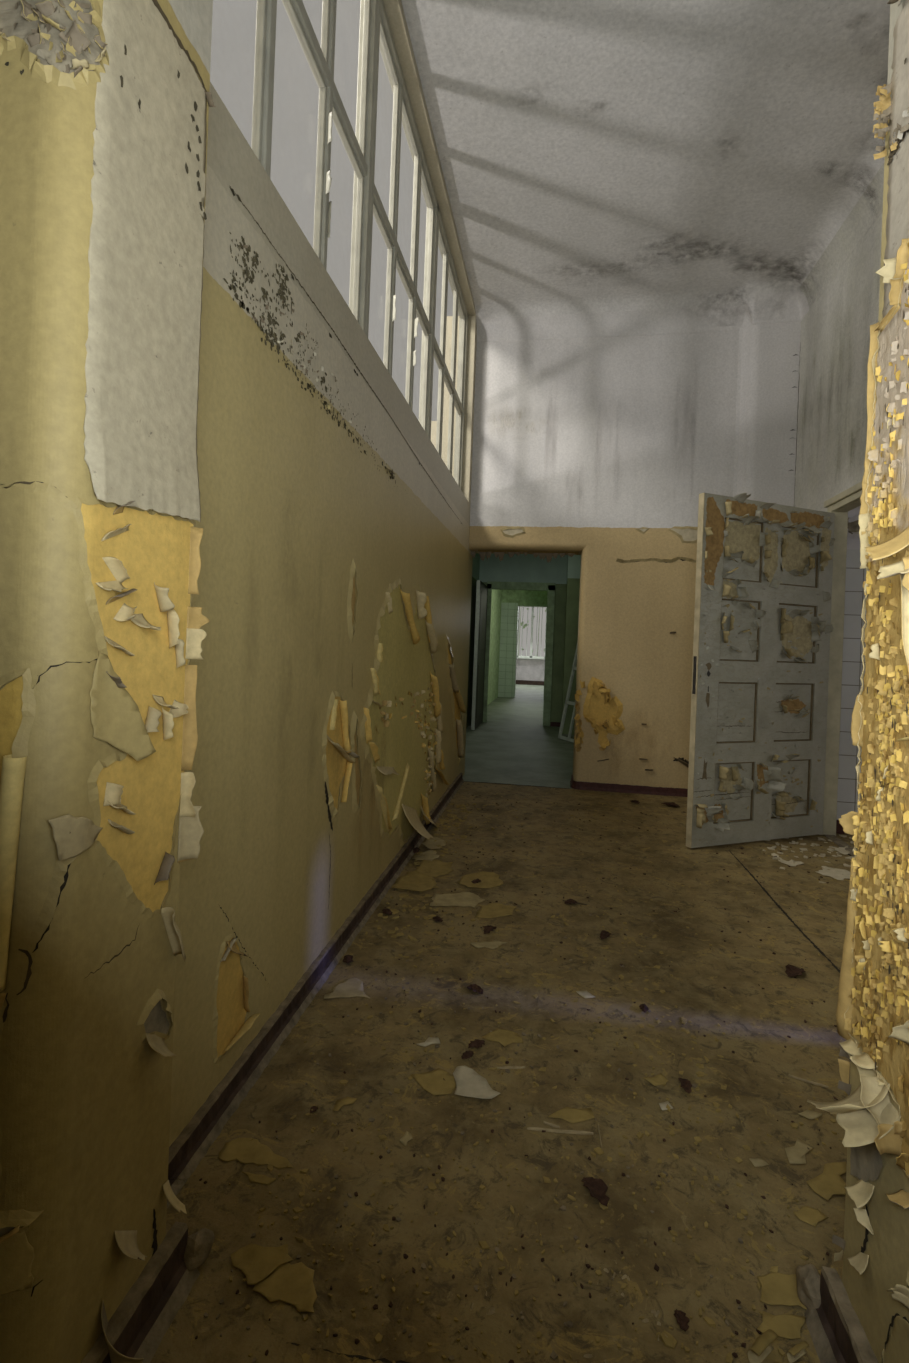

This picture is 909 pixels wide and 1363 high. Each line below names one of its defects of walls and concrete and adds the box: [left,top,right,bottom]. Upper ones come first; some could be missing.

spalling [0,0,109,90]
peeling [223,232,406,491]
peeling [669,0,909,1275]
peeling [48,496,210,962]
peeling [322,578,466,848]
peeling [574,677,625,762]
peeling [136,989,177,1057]
peeling [212,934,260,1064]
peeling [747,1273,809,1363]
peeling [879,1270,909,1363]